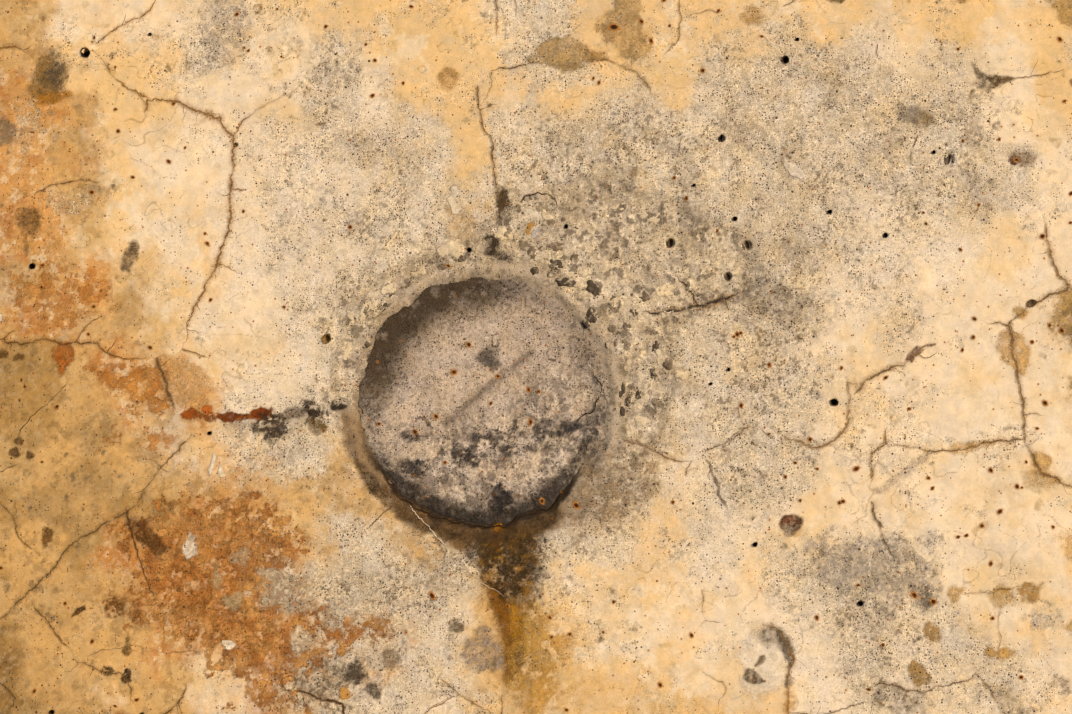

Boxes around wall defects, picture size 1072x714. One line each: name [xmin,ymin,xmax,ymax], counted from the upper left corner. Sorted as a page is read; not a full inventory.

damp [1049,0,1072,26]
crack [0,0,248,407]
rust [4,260,111,330]
spalling [331,175,749,457]
damp [1050,289,1072,341]
rust [52,342,272,423]
crack [870,227,1072,556]
rust [148,434,173,451]
rust [102,491,395,714]
rust [476,524,576,714]
crack [767,625,996,714]